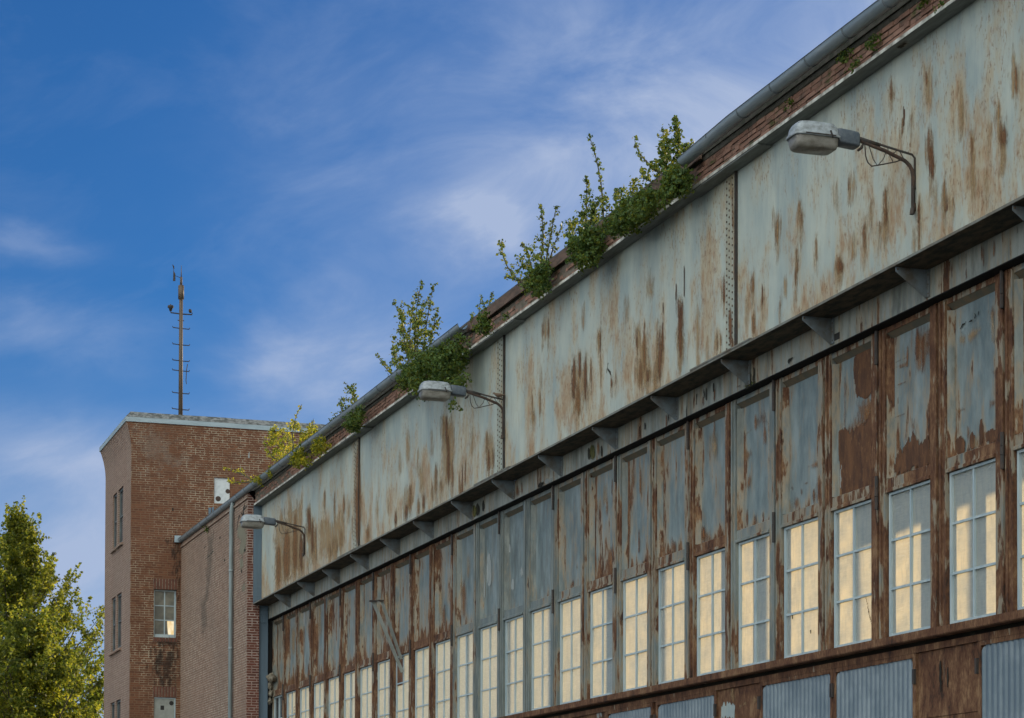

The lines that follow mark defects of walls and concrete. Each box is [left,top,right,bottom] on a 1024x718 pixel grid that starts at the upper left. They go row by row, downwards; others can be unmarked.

corrosion [925,130,954,218]
corrosion [997,103,1006,173]
corrosion [835,189,887,280]
corrosion [572,352,616,413]
corrosion [636,324,663,393]
corrosion [675,269,733,368]
corrosion [779,252,799,306]
corrosion [376,414,473,527]
corrosion [273,448,369,588]
corrosion [627,504,645,565]